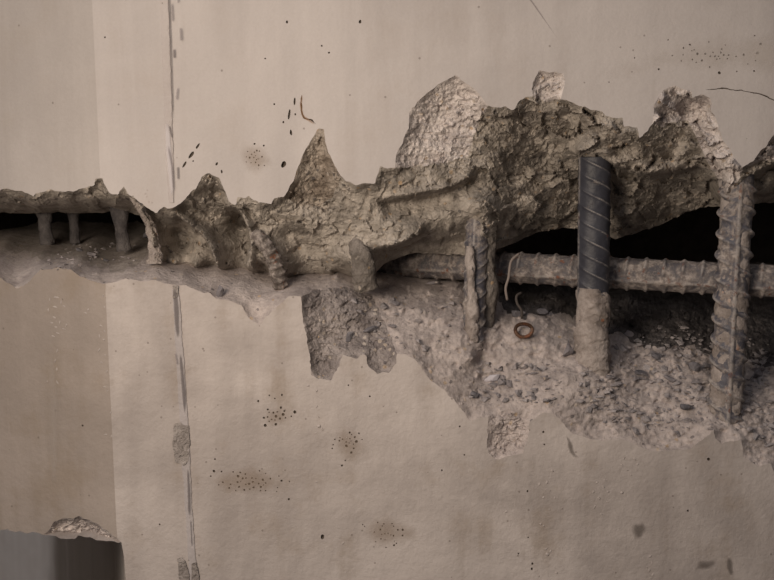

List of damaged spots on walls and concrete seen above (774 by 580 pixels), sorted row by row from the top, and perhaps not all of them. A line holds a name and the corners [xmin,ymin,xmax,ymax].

crack [706,87,774,101]
spalling [0,70,774,470]
spalling [43,516,120,542]